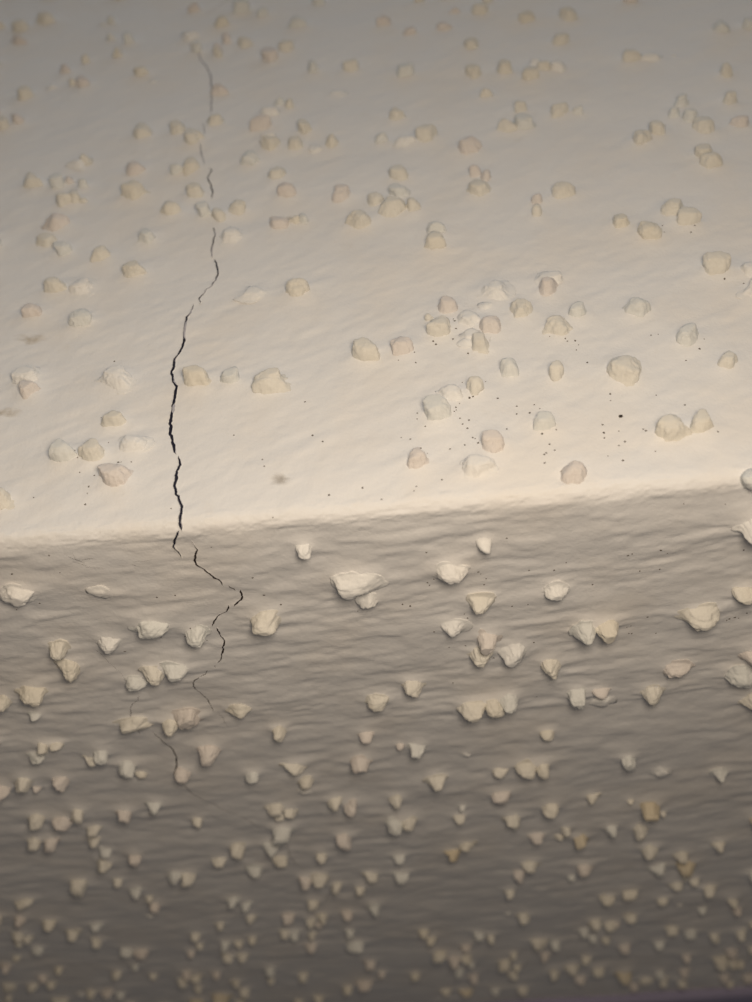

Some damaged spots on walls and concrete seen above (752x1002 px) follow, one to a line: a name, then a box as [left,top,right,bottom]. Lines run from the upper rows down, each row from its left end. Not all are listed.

crack [197,53,215,199]
crack [167,227,244,719]
crack [100,653,255,826]